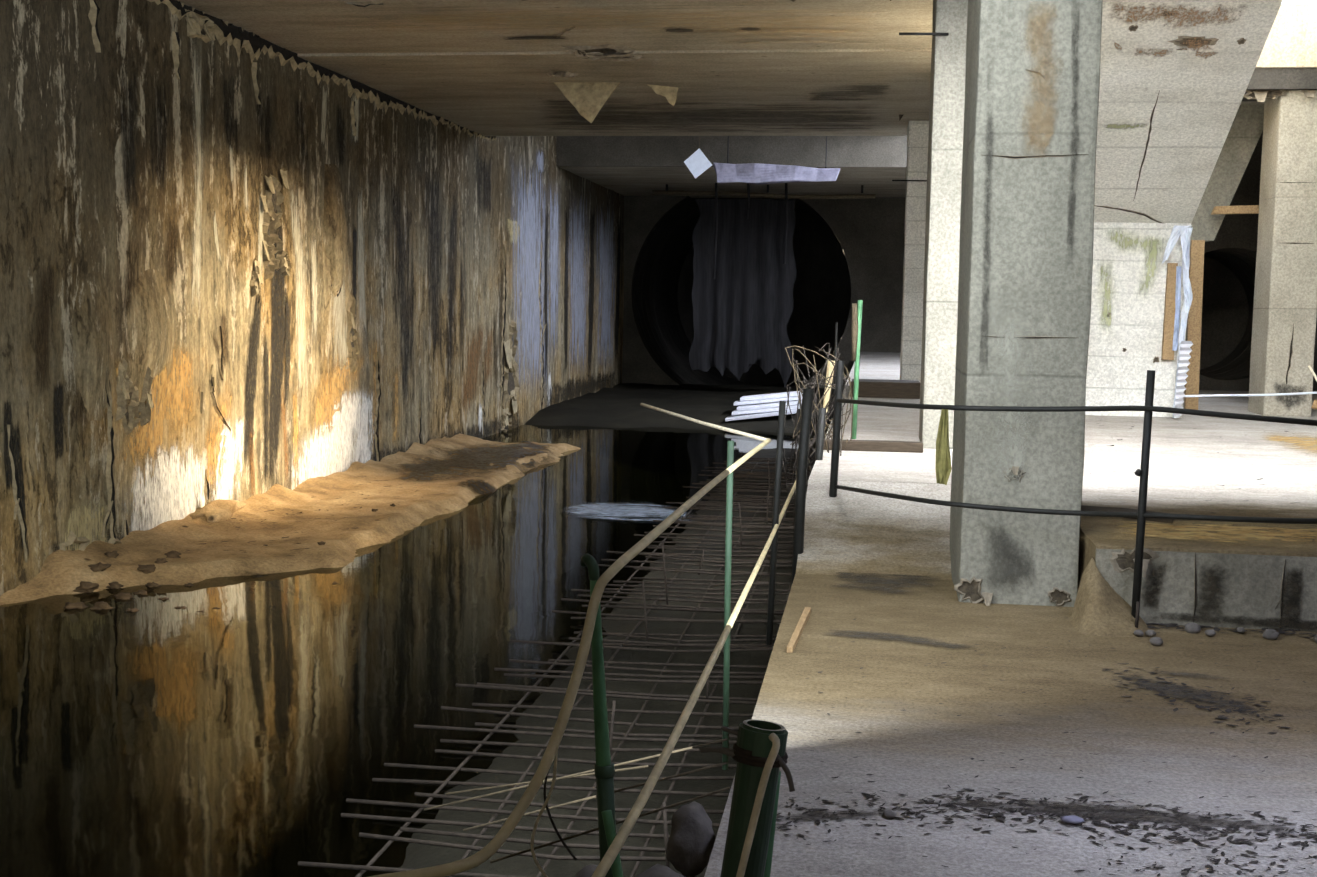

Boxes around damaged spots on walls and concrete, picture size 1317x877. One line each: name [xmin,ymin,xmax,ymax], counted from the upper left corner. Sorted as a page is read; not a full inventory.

corrosion [1114,4,1241,59]
crack [1094,90,1163,223]
leakage [4,402,29,555]
leakage [35,271,87,458]
spalling [115,358,154,436]
corrosion [124,349,193,465]
corrosion [206,385,232,484]
spalling [249,169,290,297]
leakage [54,57,547,551]
corrosion [315,343,379,443]
leakage [493,152,620,407]
crack [1286,323,1294,384]